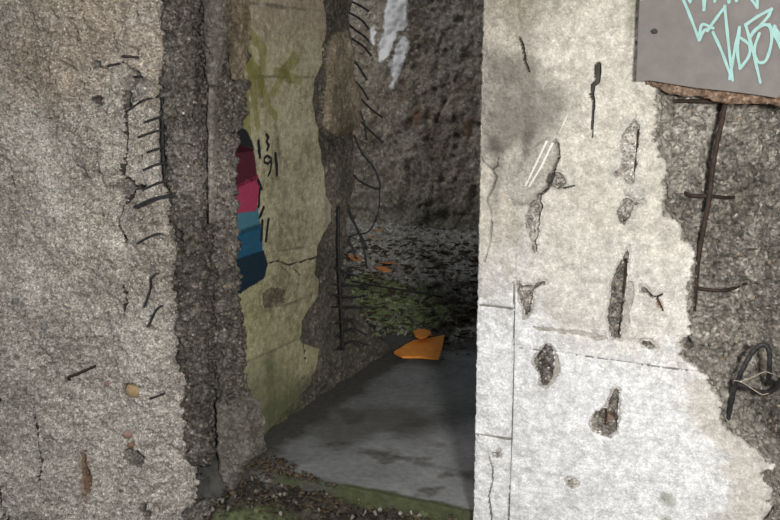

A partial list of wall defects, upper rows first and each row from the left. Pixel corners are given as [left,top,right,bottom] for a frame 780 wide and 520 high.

efflorescence [370,0,410,89]
spalling [120,66,168,195]
spalling [116,178,144,199]
spalling [271,0,444,428]
crack [481,156,500,263]
spalling [515,244,651,342]
spalling [608,81,780,520]
spalling [531,343,561,390]
crack [476,270,688,520]
spalling [589,387,622,439]